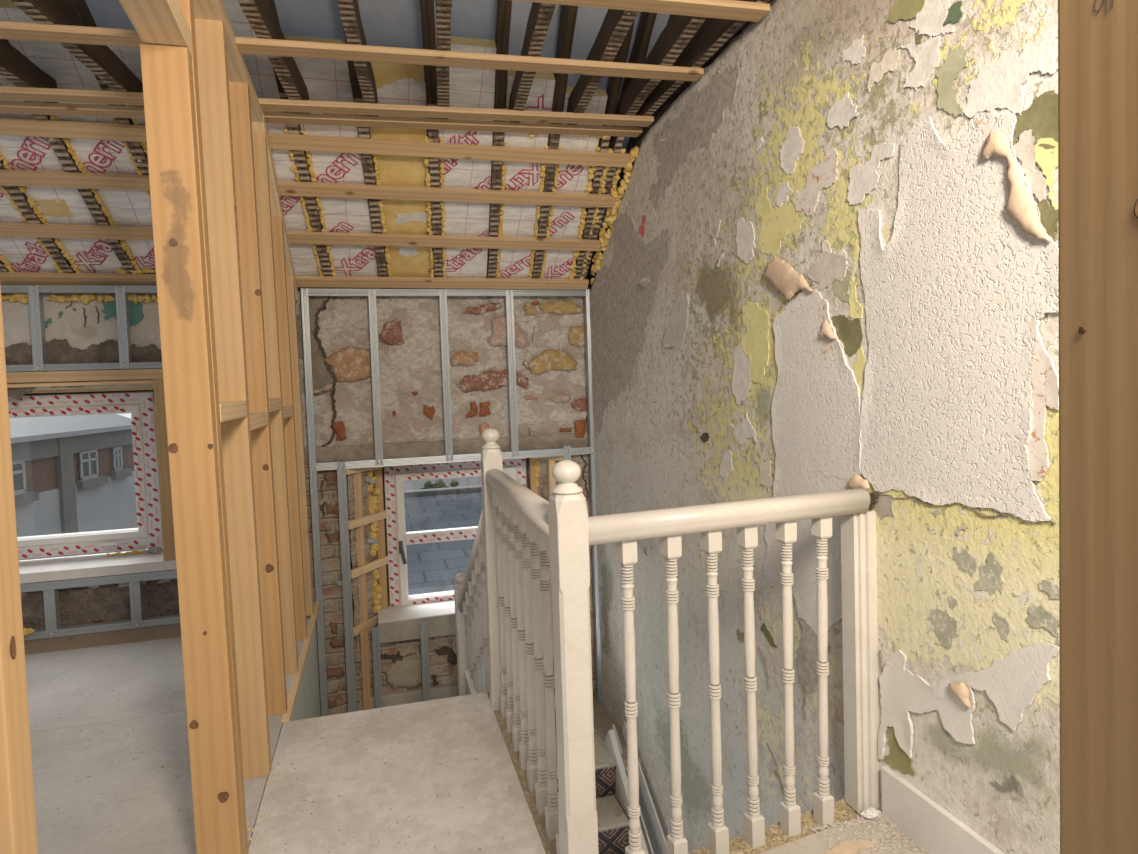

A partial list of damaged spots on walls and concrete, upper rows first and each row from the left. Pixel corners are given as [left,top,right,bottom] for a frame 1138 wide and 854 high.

peeling [826,92,859,129]
peeling [842,0,1058,242]
peeling [716,126,895,267]
crack [313,297,338,447]
flaking render [297,297,372,393]
peeling [719,301,771,482]
peeling [807,233,866,397]
crack [320,478,329,541]
crack [876,491,1016,517]
peeling [953,526,1004,595]
peeling [931,596,960,649]
peeling [884,726,915,776]